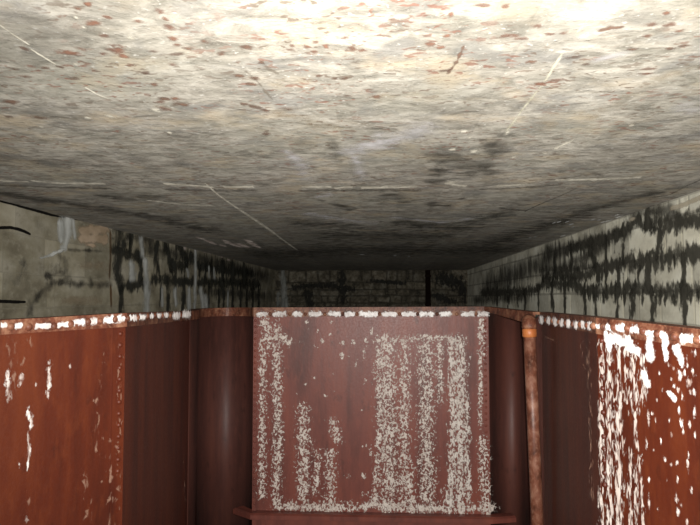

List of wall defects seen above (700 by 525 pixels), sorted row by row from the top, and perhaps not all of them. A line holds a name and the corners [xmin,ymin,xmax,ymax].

crack [440,46,464,74]
damp [0,192,124,212]
damp [35,183,700,525]
damp [19,410,34,470]